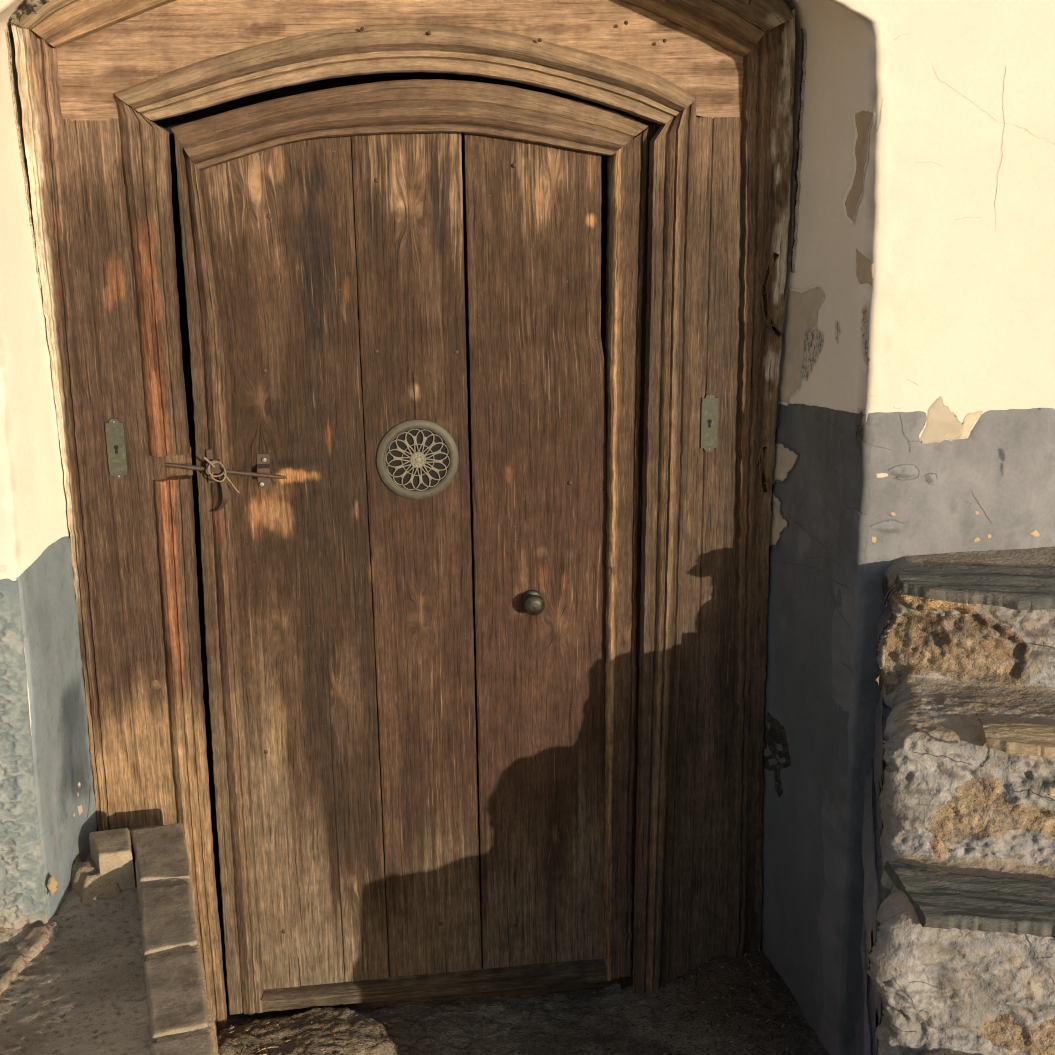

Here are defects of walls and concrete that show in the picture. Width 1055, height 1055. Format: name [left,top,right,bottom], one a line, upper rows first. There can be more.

peeling [842,98,883,225]
crack [932,64,1055,232]
peeling [856,248,874,286]
peeling [761,252,825,406]
peeling [920,396,983,444]
spalling [876,574,1032,694]
spalling [925,776,1055,859]
spalling [977,1014,1055,1055]